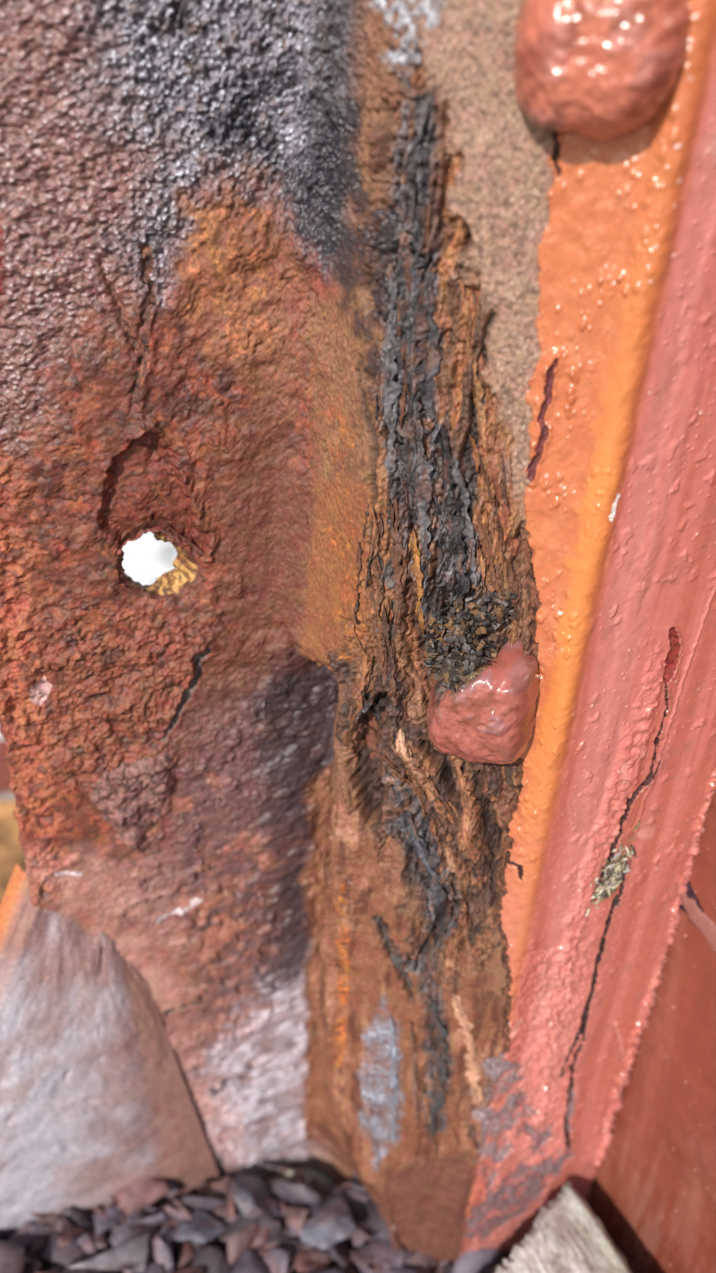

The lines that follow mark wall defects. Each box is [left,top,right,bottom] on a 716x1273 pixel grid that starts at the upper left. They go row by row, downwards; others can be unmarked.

rust [185,204,276,358]
crack [527,359,558,482]
rust [114,519,204,601]
peeling [519,535,542,674]
rust [91,752,174,852]
crack [559,627,681,1151]
peeling [464,757,576,1239]